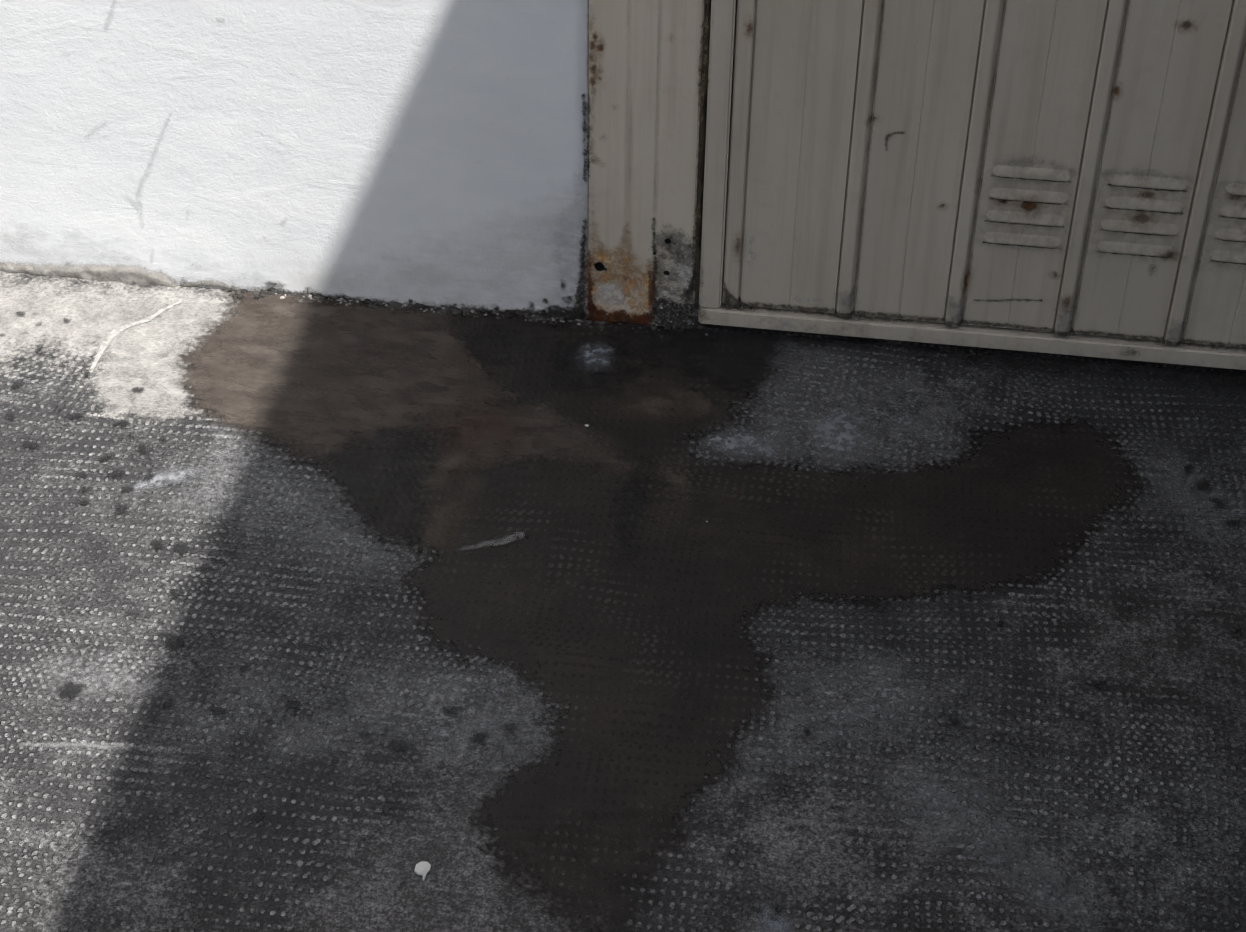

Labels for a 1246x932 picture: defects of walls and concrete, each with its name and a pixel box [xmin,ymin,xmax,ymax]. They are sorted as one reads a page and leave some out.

water stain [581,94,590,181]
corrosion [585,231,655,326]
water stain [135,219,1246,932]
water stain [28,648,156,708]